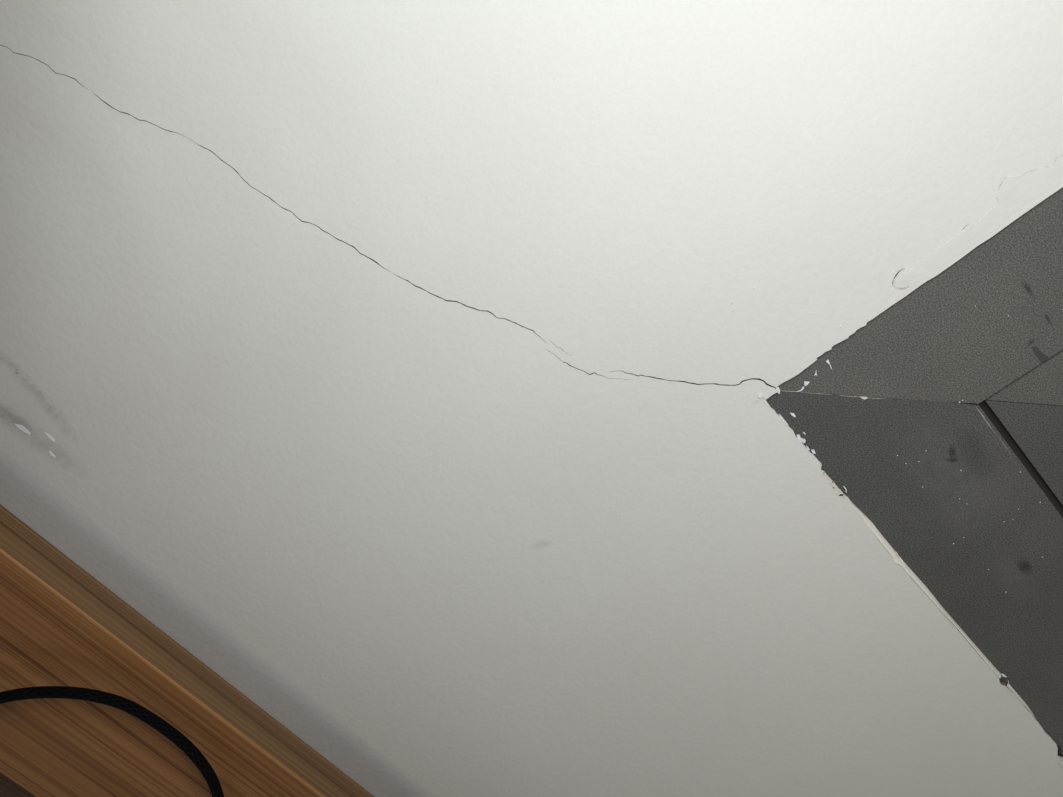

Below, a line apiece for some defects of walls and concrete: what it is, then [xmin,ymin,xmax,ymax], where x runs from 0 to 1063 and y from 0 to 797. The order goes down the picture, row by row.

crack [1,45,776,389]
peeling [892,155,1063,290]
spalling [778,413,816,454]
spalling [822,470,847,499]